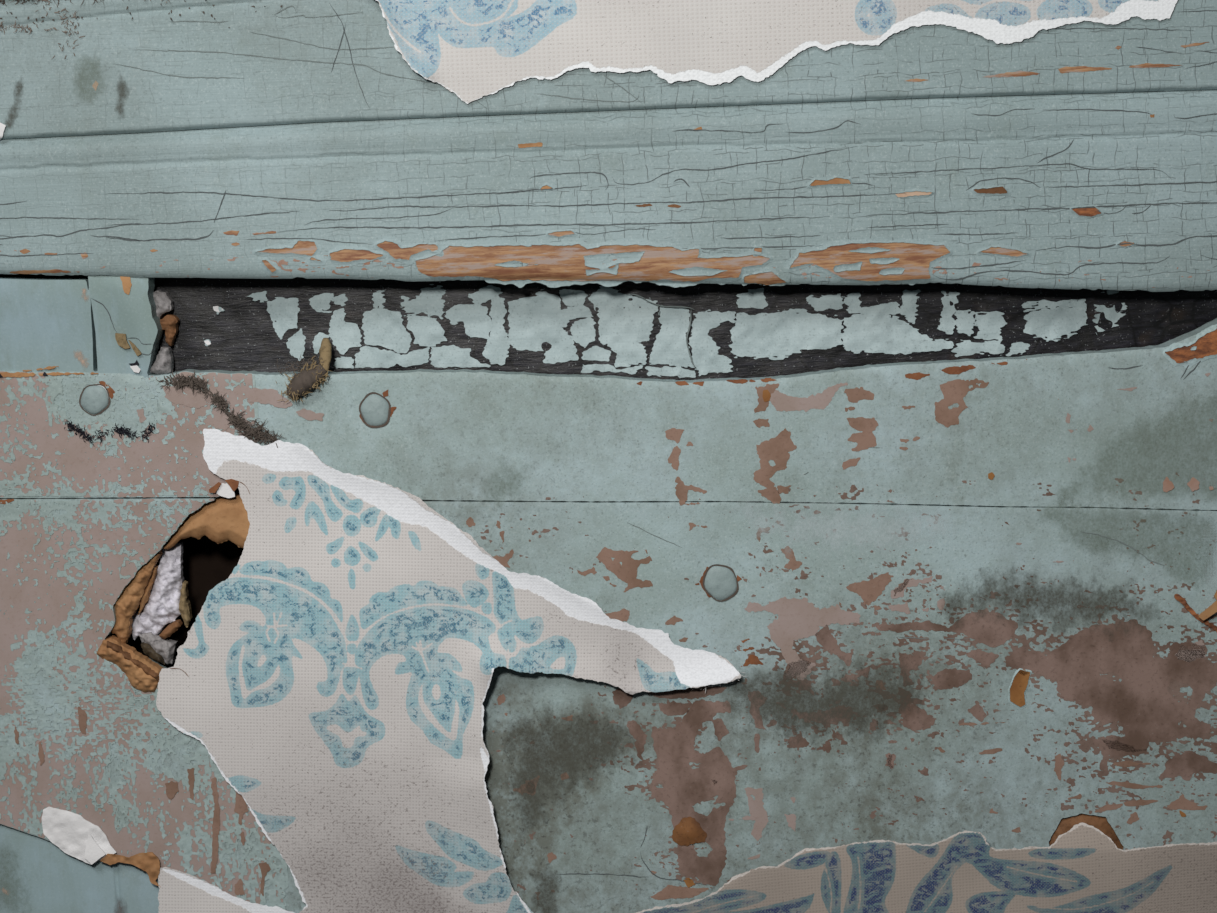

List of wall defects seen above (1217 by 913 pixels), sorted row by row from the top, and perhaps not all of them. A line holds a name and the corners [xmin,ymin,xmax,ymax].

crack [115,2,442,105]
crack [543,75,639,102]
crack [1059,109,1217,119]
crack [0,120,1217,280]
peeling [1069,204,1104,220]
crack [632,294,696,368]
peeling [0,290,324,910]
peeling [223,229,1217,900]
damp [979,579,1142,619]
damp [734,671,913,733]
damp [507,717,621,824]